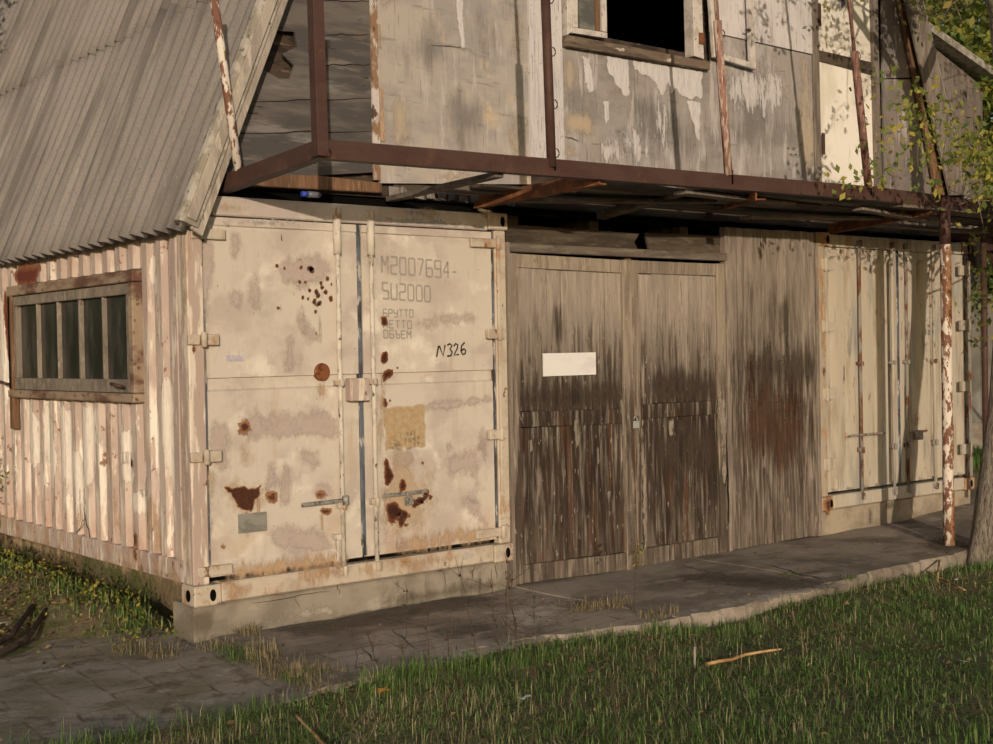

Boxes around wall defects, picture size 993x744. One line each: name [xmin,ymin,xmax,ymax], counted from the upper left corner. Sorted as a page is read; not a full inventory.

peeling [606,56,703,140]
corrosion [298,259,333,334]
peeling [29,403,95,521]
peeling [120,429,148,516]
peeling [158,376,175,493]
corrosion [238,419,252,436]
corrosion [224,484,278,513]
corrosion [381,351,398,381]
corrosion [379,396,433,527]
damp [520,376,620,411]
damp [654,364,713,403]
damp [733,303,814,475]